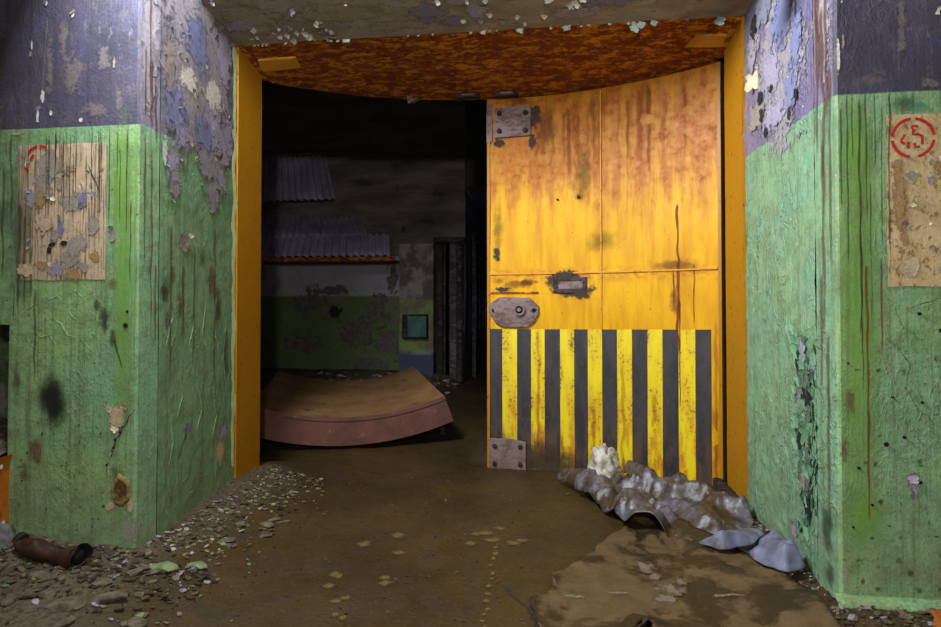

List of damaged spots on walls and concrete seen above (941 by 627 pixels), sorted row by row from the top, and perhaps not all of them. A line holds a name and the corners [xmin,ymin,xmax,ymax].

peeling [150,0,527,213]
rust [529,105,542,150]
peeling [540,0,642,32]
peeling [627,20,658,33]
peeling [744,0,814,160]
peeling [105,403,128,433]
spalling [102,473,134,513]
rust [673,205,681,403]
peeling [789,331,817,541]
crack [881,298,940,457]